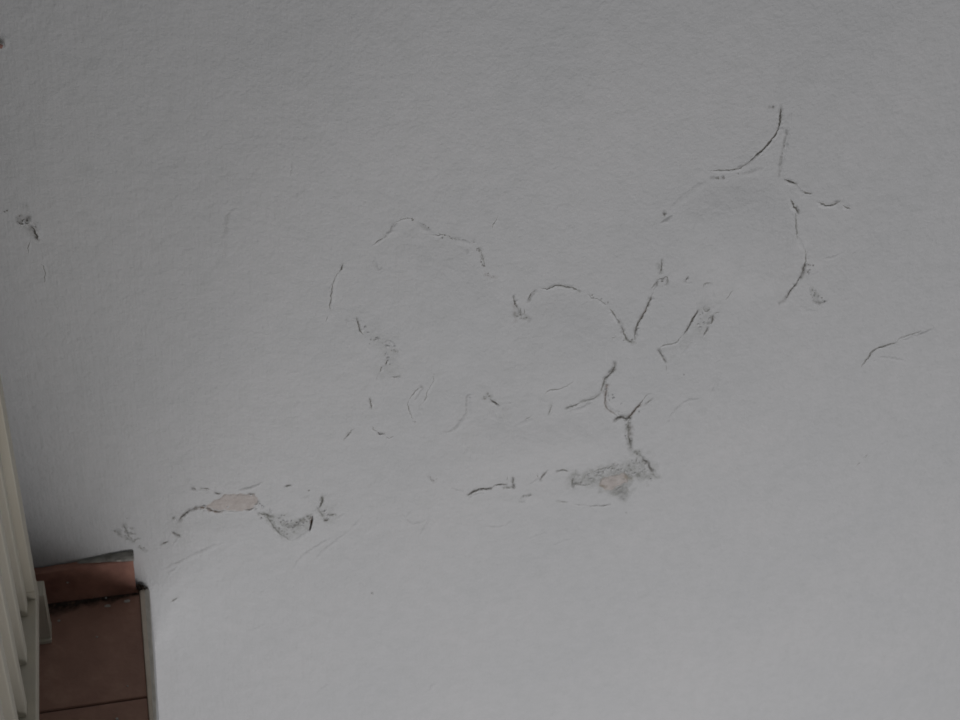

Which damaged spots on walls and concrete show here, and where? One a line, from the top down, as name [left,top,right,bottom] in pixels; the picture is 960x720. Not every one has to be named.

crack [710,105,788,174]
crack [371,216,499,278]
crack [784,178,851,299]
crack [325,263,350,326]
crack [527,282,659,343]
crack [860,328,935,368]
crack [368,397,394,440]
crack [544,363,654,448]
spalling [179,482,350,543]
crack [467,467,569,499]